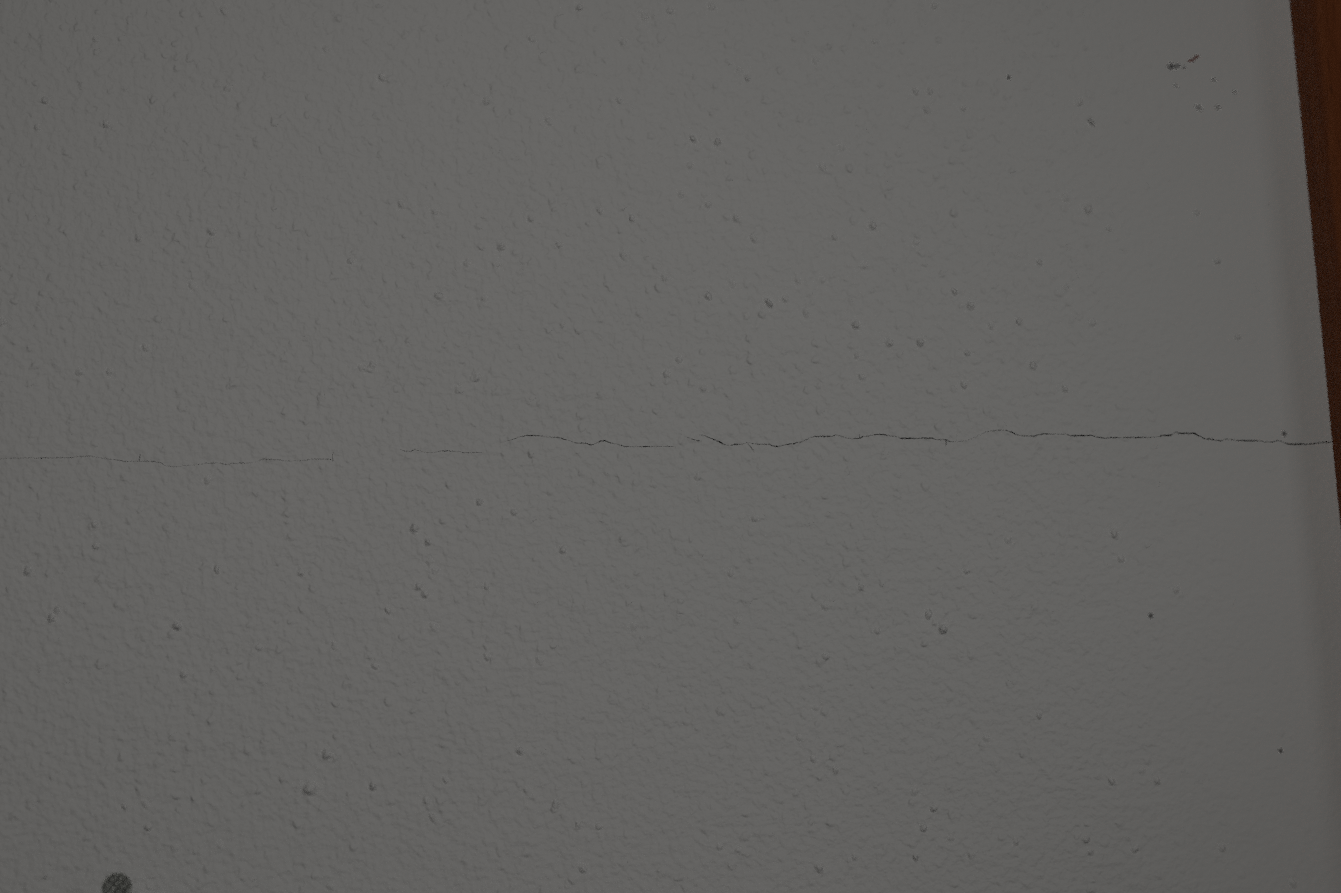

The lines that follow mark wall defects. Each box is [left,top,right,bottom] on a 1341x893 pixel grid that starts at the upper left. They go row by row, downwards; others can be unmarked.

crack [508,430,1332,450]